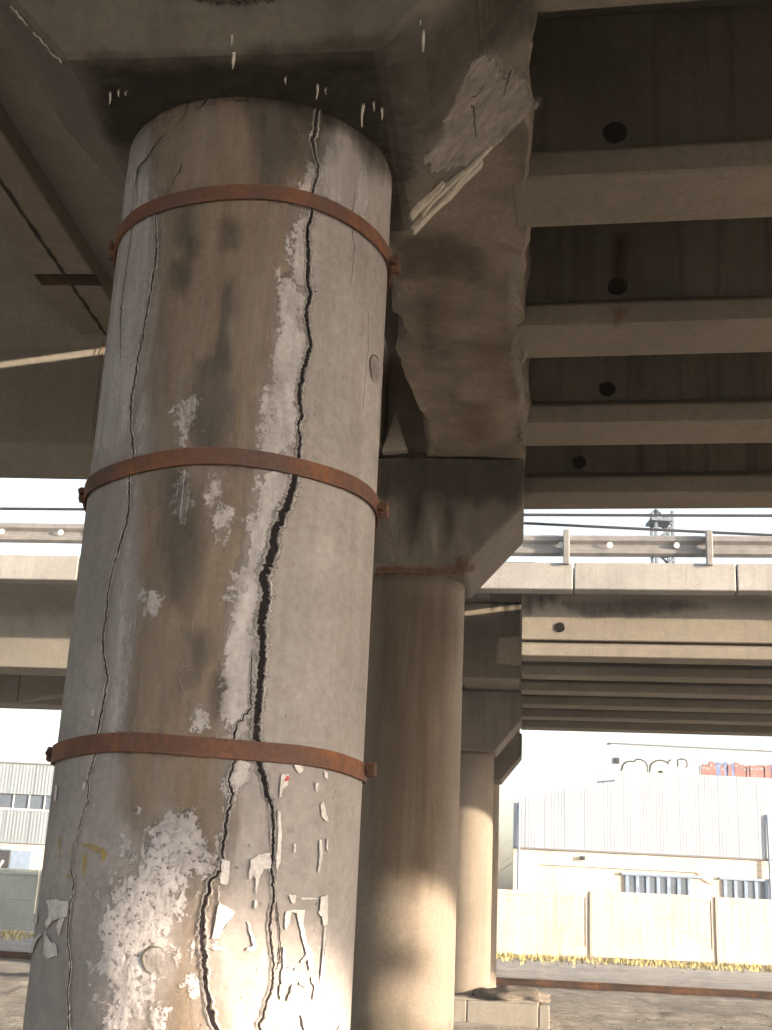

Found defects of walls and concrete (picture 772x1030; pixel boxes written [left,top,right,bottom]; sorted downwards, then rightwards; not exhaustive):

spalling [409,54,539,235]
damp [95,0,531,459]
crack [65,97,249,1030]
damp [108,464,297,739]
crack [195,109,321,1030]
damp [378,453,532,569]
damp [492,595,688,617]
peeling [279,764,303,797]
peeling [315,771,329,822]
peeling [212,858,235,951]
peeling [249,810,296,909]
peeling [279,894,328,1001]